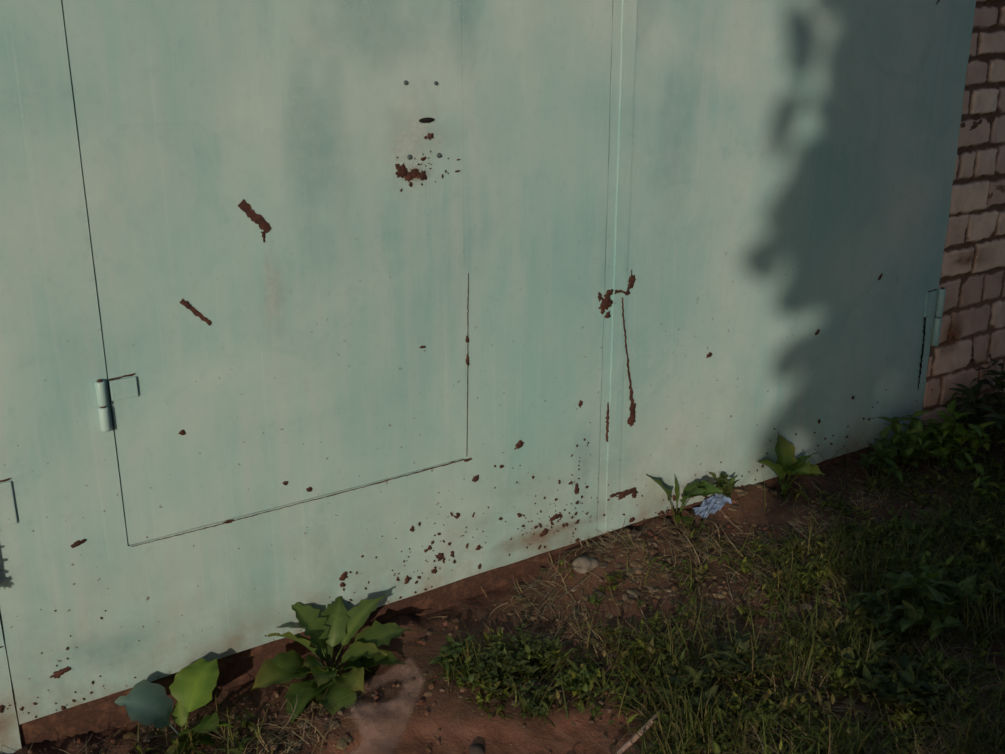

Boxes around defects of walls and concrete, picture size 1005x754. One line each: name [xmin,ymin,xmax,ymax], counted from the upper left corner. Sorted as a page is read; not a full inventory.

rust [395,133,449,192]
rust [598,270,636,427]
rust [610,487,638,500]
rust [50,666,71,678]